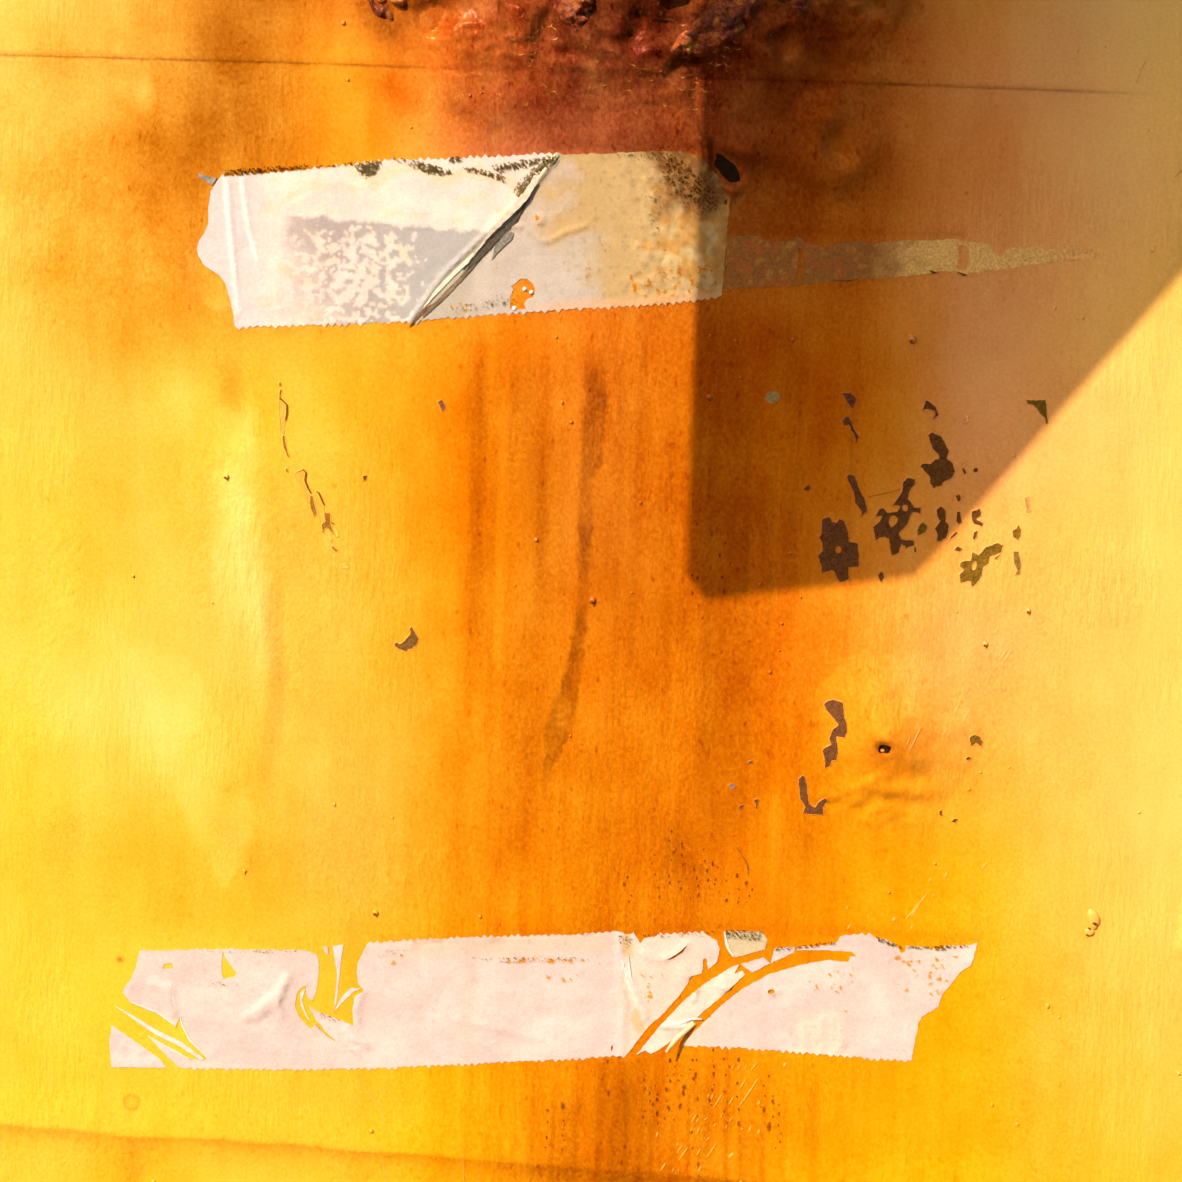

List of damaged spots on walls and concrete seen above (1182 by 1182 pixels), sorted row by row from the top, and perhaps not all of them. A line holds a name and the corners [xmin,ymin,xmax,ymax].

rust [368,0,933,236]
peeling [841,392,860,443]
peeling [1025,399,1049,425]
peeling [846,400,1022,588]
peeling [817,516,860,583]
peeling [394,626,420,652]
rust [413,257,894,1182]
peeling [822,699,848,769]
peeling [798,775,829,816]